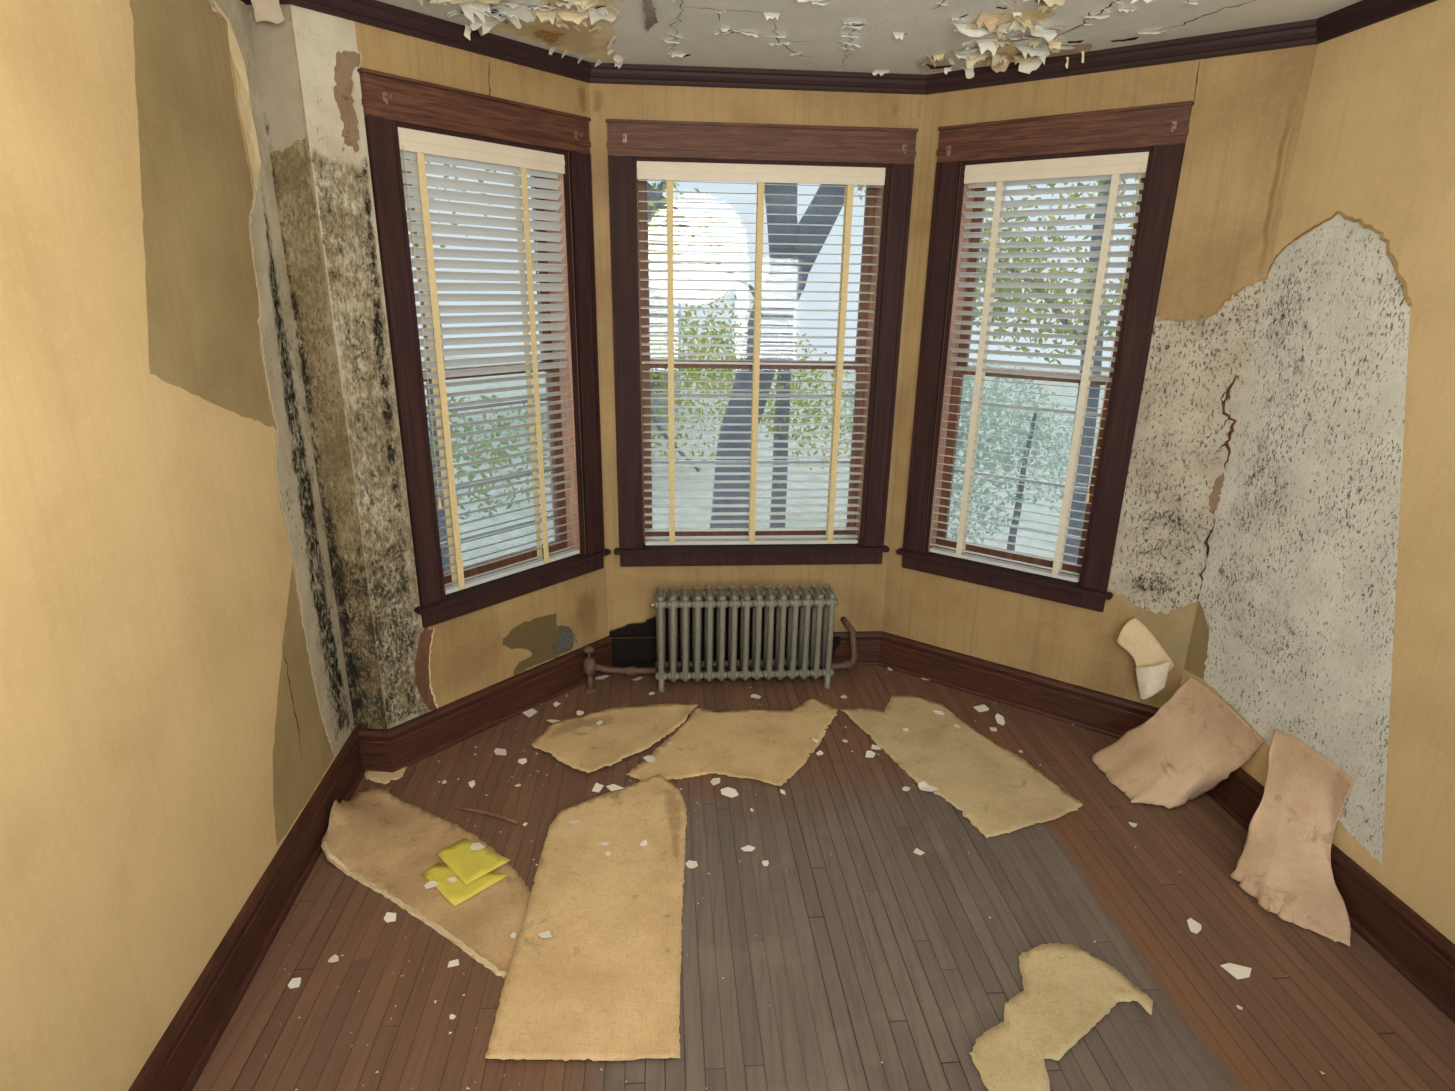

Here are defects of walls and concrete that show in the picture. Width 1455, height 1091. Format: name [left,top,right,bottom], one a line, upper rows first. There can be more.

peeling [417,0,625,69]
peeling [643,0,658,31]
crack [663,0,863,67]
peeling [949,0,1092,79]
crack [1057,0,1249,36]
flaking render [209,0,438,757]
water stain [264,126,429,741]
crack [1219,373,1237,469]
flaking render [1108,211,1412,865]